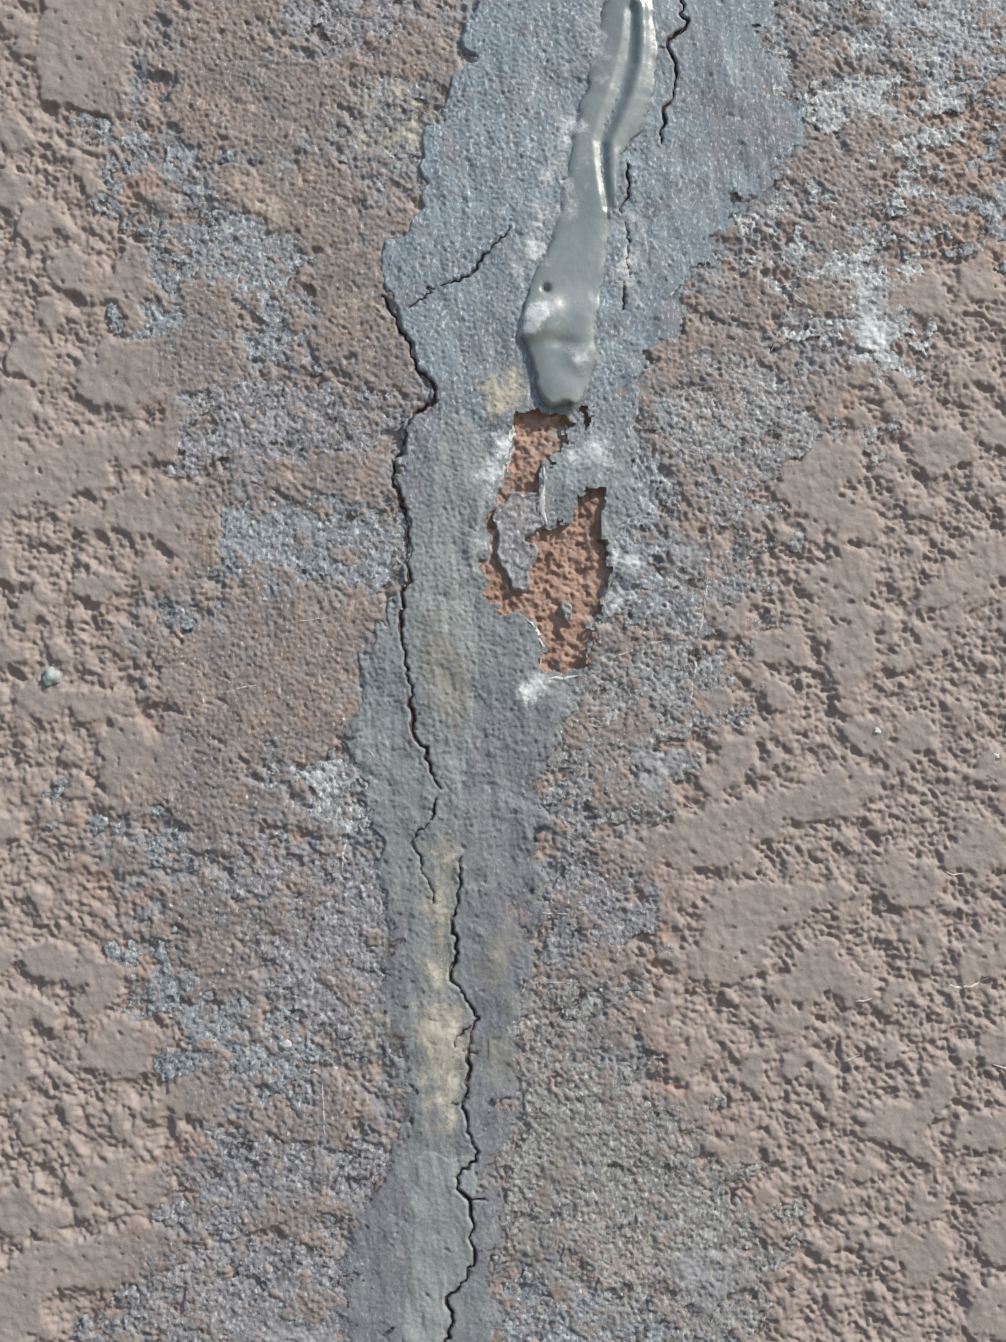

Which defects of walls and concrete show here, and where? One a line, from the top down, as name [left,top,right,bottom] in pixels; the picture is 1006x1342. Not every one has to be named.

crack [659,0,690,144]
crack [619,163,630,311]
spalling [478,403,613,680]
crack [382,228,510,1342]